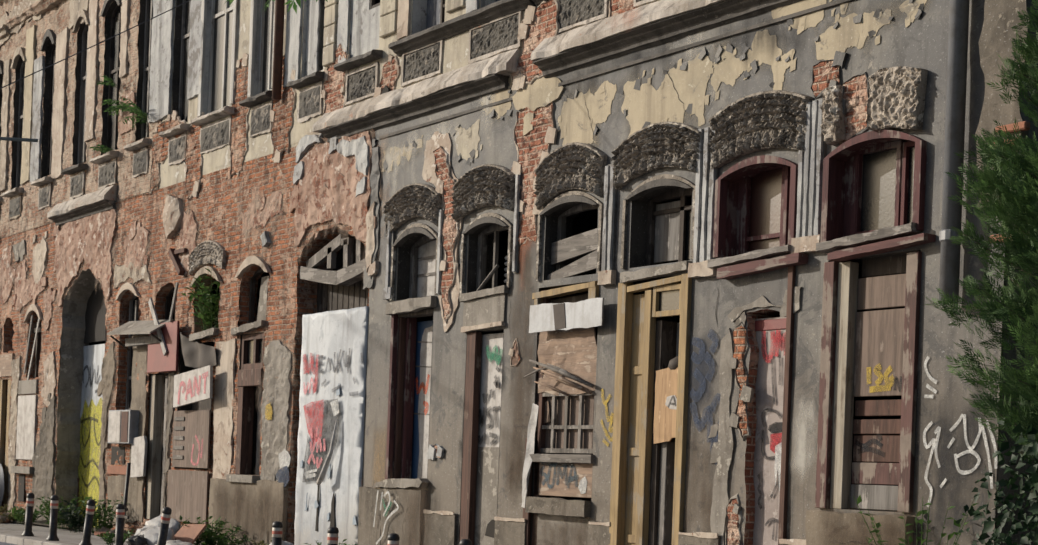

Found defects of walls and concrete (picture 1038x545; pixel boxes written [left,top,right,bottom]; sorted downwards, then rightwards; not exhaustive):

flaking render [230,53,251,178]
flaking render [270,55,297,163]
peeling [289,161,304,213]
peeling [319,133,342,154]
flaking render [321,44,350,115]
peeling [355,176,367,198]
peeling [372,0,927,324]
peeling [363,261,379,290]
flaking render [708,311,754,463]
flaking render [725,494,744,545]